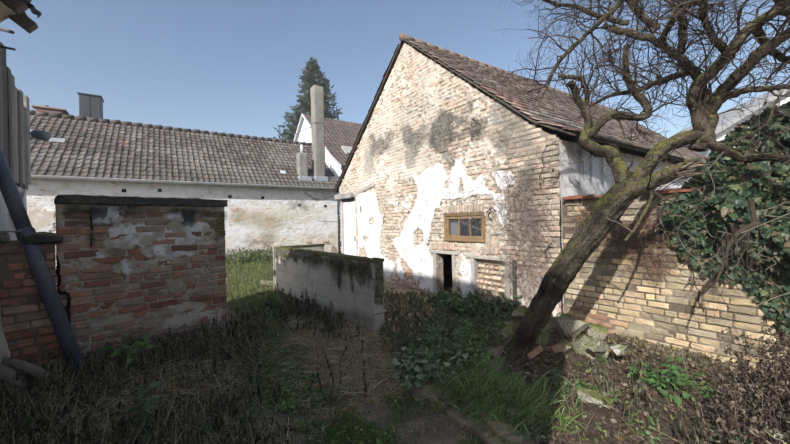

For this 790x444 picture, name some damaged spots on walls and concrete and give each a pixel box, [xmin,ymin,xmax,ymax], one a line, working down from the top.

damp [403,105,539,160]
crack [86,215,96,247]
peeling [76,206,216,277]
peeling [356,157,519,302]
crack [56,255,72,323]
peeling [130,279,223,336]
peeling [510,268,542,307]